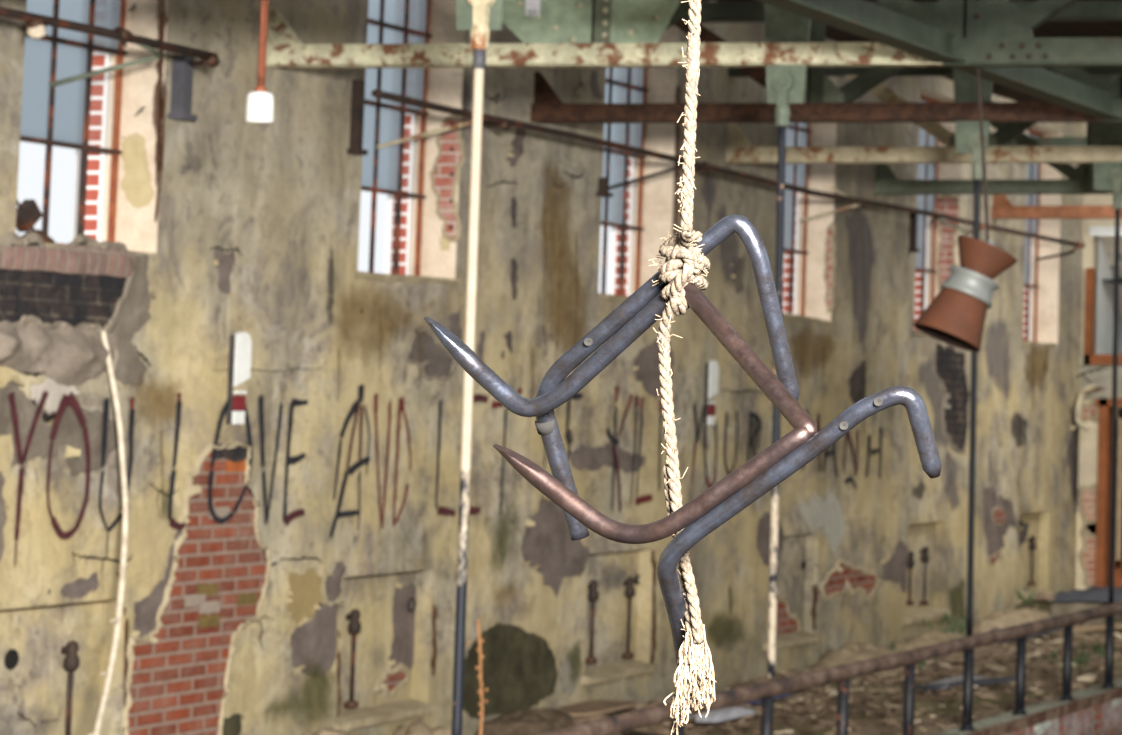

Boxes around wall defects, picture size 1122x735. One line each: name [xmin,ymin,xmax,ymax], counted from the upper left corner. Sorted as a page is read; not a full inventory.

spalling [429,115,465,250]
spalling [0,231,155,388]
spalling [122,441,271,735]
peeling [286,559,346,676]
water stain [463,623,558,719]
spalling [820,540,909,602]
peeling [982,485,1029,567]